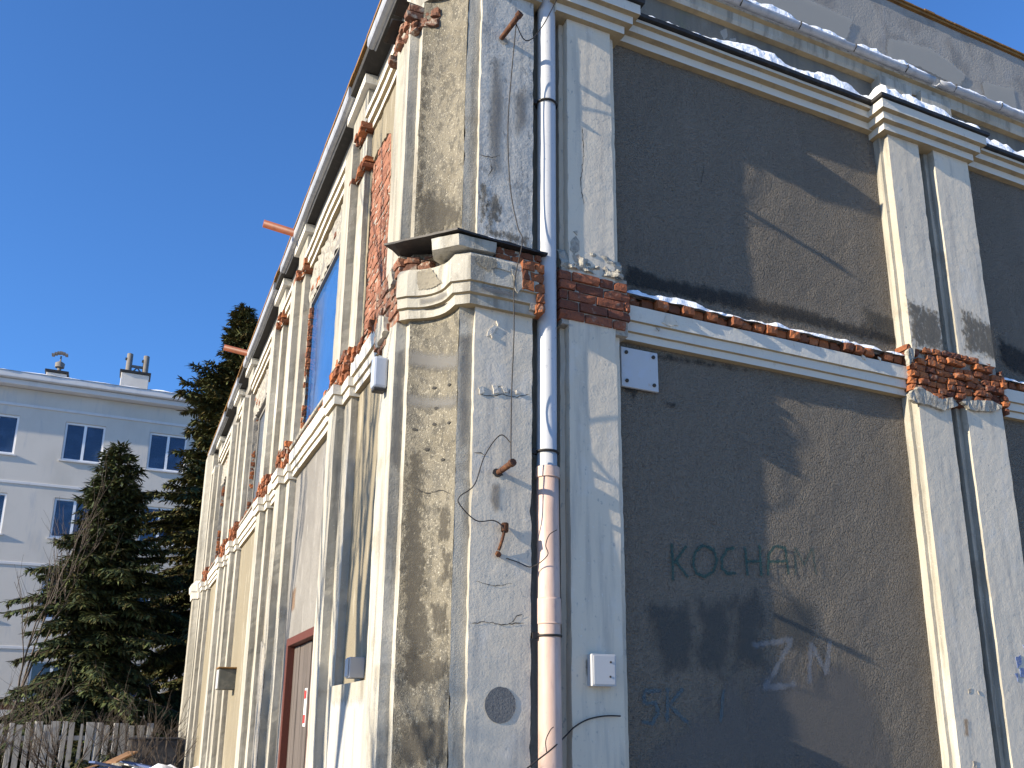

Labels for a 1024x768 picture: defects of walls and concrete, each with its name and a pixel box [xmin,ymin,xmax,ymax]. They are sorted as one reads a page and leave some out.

spalling [383,0,441,70]
damp [414,56,466,236]
peeling [349,85,442,356]
spalling [246,204,343,510]
spalling [327,346,353,392]
spalling [476,230,630,343]
peeling [656,314,678,331]
spalling [895,344,1010,417]
spalling [202,455,240,582]
damp [393,337,469,687]
crack [471,614,522,625]
damp [397,714,445,766]